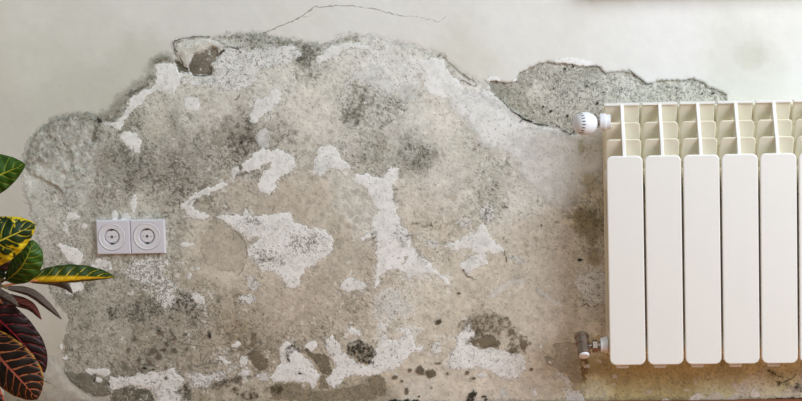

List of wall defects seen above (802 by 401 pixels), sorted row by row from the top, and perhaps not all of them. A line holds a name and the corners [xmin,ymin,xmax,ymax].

water stain [97,75,156,123]
spalling [486,57,727,141]
peeling [21,33,606,401]
water stain [109,304,188,379]
water stain [212,376,258,400]
water stain [347,340,376,364]
water stain [408,362,441,389]
water stain [459,314,531,353]
water stain [581,336,802,401]